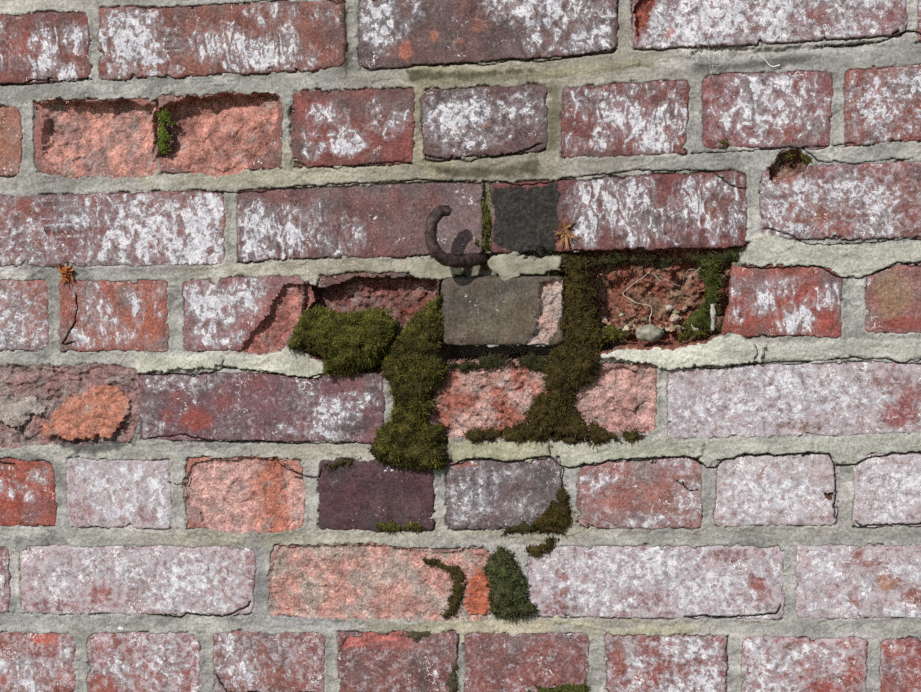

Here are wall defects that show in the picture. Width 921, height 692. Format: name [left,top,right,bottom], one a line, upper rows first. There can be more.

leakage [99,9,185,78]
leakage [189,3,319,72]
leakage [488,0,616,52]
spalling [631,0,655,38]
leakage [643,0,904,48]
leakage [565,83,687,153]
leakage [707,74,830,145]
spalling [767,148,809,182]
crack [62,293,78,345]
spalling [236,274,441,355]
spalling [431,248,738,441]
spalling [0,362,140,449]